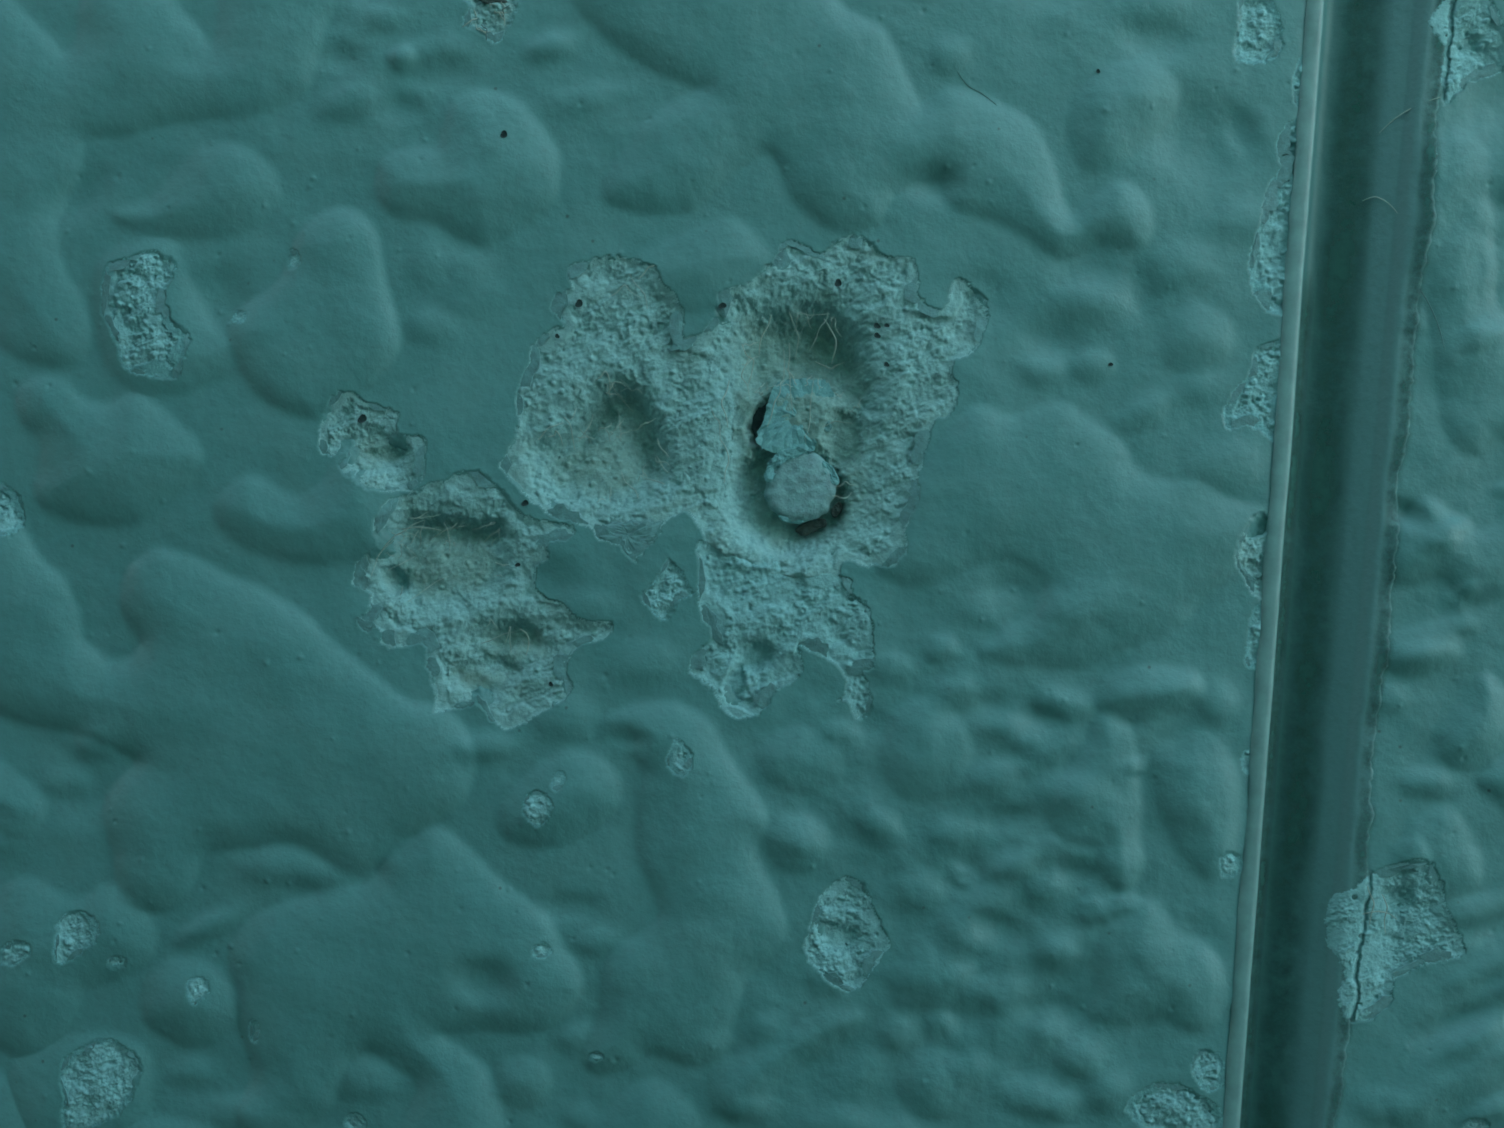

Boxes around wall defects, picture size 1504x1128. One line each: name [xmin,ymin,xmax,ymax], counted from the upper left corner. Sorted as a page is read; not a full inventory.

peeling [462,0,520,44]
peeling [1233,0,1285,65]
peeling [1428,0,1504,105]
peeling [1248,55,1303,317]
peeling [100,250,192,379]
peeling [1221,339,1282,443]
peeling [0,482,25,536]
spalling [318,234,989,730]
peeling [803,876,891,992]
peeling [1324,858,1465,1022]
peeling [59,1039,143,1128]
peeling [1125,1051,1226,1128]